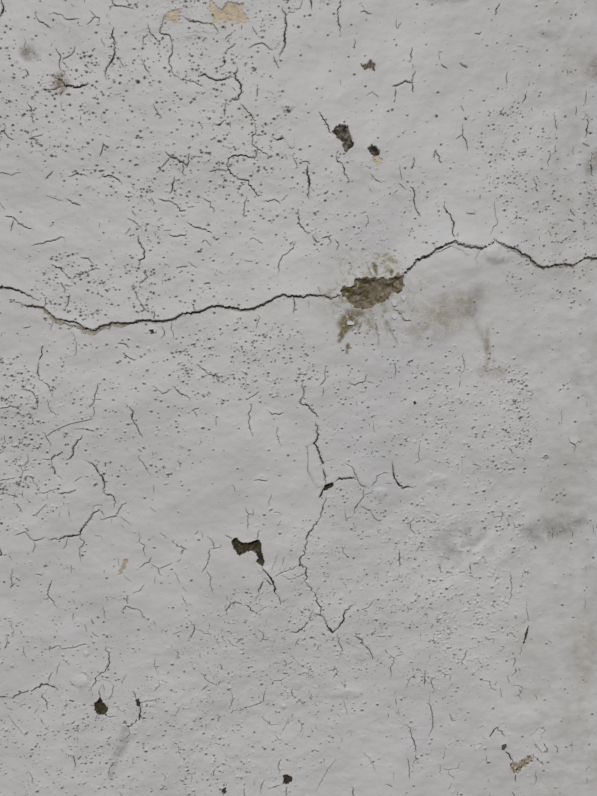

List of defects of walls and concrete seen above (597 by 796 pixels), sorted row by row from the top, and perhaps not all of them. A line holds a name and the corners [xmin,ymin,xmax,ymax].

peeling [209,0,249,24]
peeling [333,125,354,152]
peeling [368,145,382,167]
crack [0,0,350,363]
spalling [340,271,407,320]
peeling [510,755,534,774]